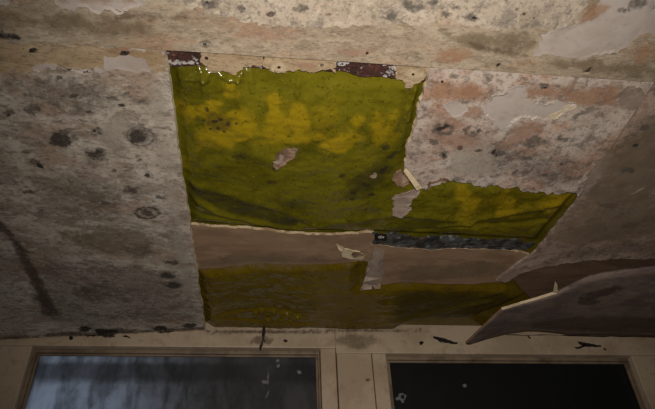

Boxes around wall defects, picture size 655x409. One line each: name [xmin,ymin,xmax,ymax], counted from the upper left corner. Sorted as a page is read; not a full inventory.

peeling [166,0,655,60]
leakage [271,61,286,72]
mould [49,129,71,147]
leakage [93,96,154,146]
peeling [443,101,469,118]
peeling [483,85,579,131]